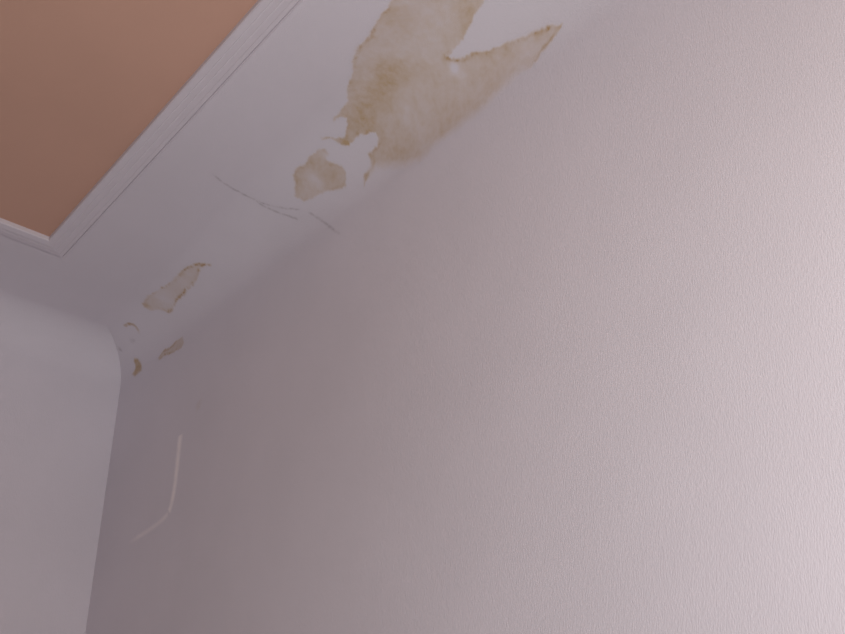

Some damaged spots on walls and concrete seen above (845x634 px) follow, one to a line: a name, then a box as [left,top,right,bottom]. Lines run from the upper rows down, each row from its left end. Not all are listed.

leakage [290,0,564,203]
leakage [139,261,213,315]